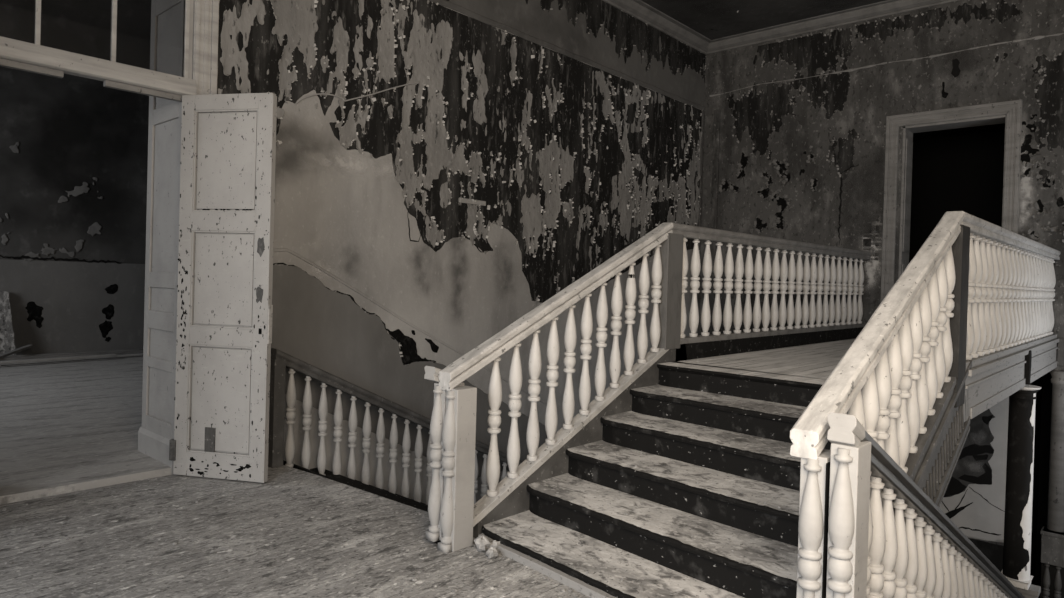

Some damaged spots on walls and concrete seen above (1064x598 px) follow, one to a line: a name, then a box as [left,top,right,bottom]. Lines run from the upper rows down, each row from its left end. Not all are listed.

peeling [719,0,1023,235]
peeling [1020,50,1064,188]
peeling [217,0,706,306]
flaking render [58,177,103,203]
flaking render [24,222,101,261]
peeling [1028,197,1064,243]
flaking render [25,301,44,328]
flaking render [99,284,118,342]
peeling [177,225,188,384]
flaking render [360,306,439,365]
peeling [1052,259,1064,371]
peeling [189,421,260,478]